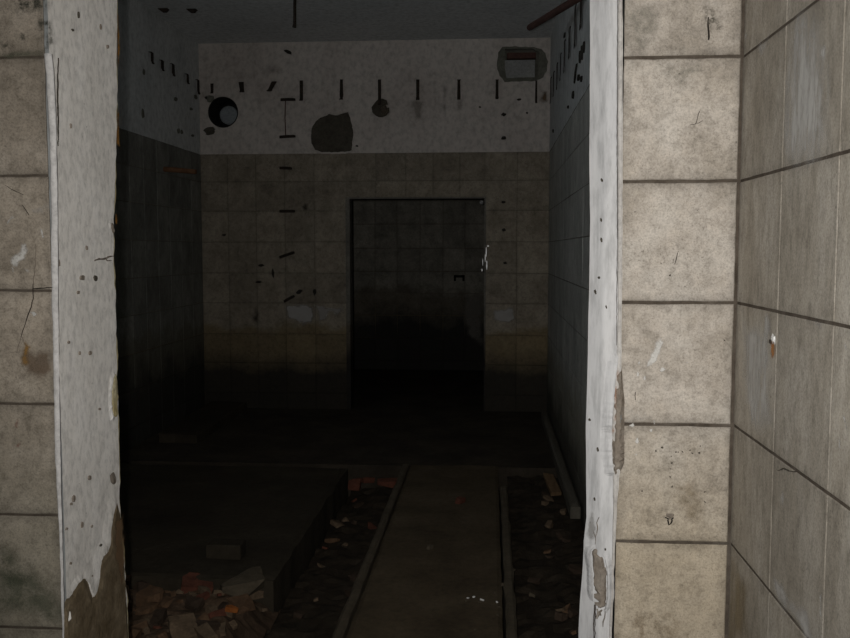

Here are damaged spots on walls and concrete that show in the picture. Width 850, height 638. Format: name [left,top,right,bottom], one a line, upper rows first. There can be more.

flaking render [310,111,355,154]
crack [17,244,52,351]
corrosion [22,345,49,374]
flaking render [98,337,119,432]
flaking render [588,353,634,476]
flaking render [64,450,129,638]
flaking render [584,545,614,613]